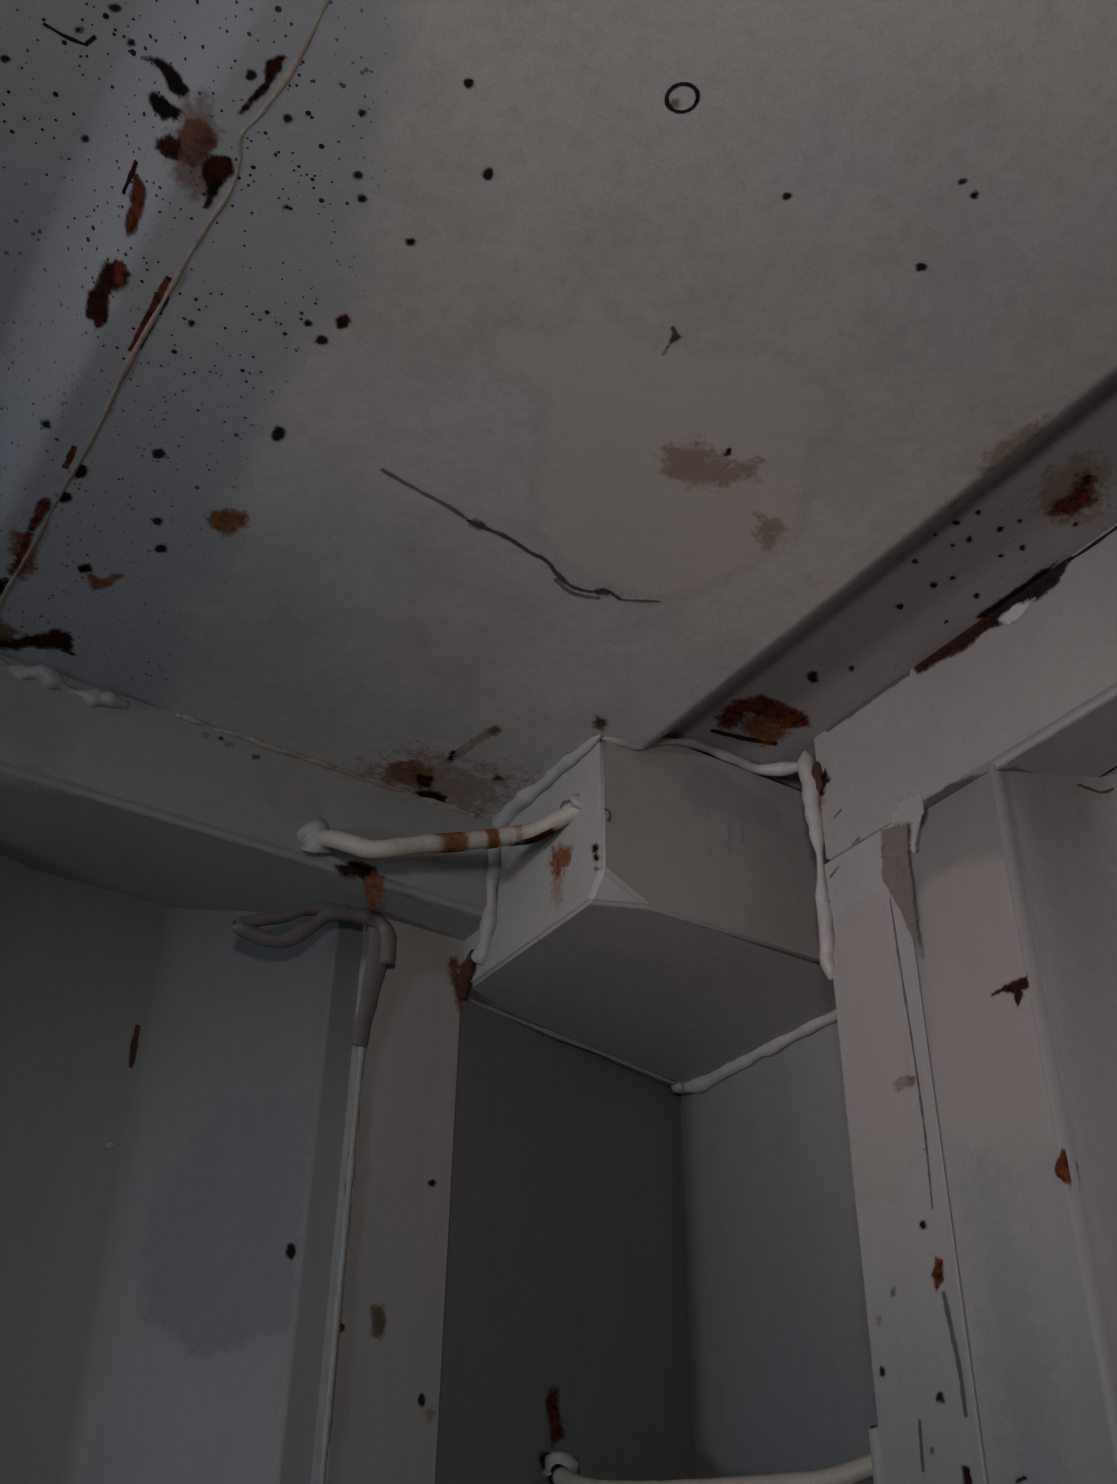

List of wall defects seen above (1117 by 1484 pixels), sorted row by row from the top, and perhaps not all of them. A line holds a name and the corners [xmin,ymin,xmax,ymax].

rust [239,55,285,114]
rust [142,57,234,208]
rust [122,159,146,234]
rust [85,260,130,328]
rust [127,276,172,352]
rust [0,445,87,595]
crack [467,519,621,600]
rust [0,624,75,656]
peeling [914,556,1072,673]
rust [710,695,808,746]
rust [991,977,1028,1006]
rust [1055,1149,1077,1183]